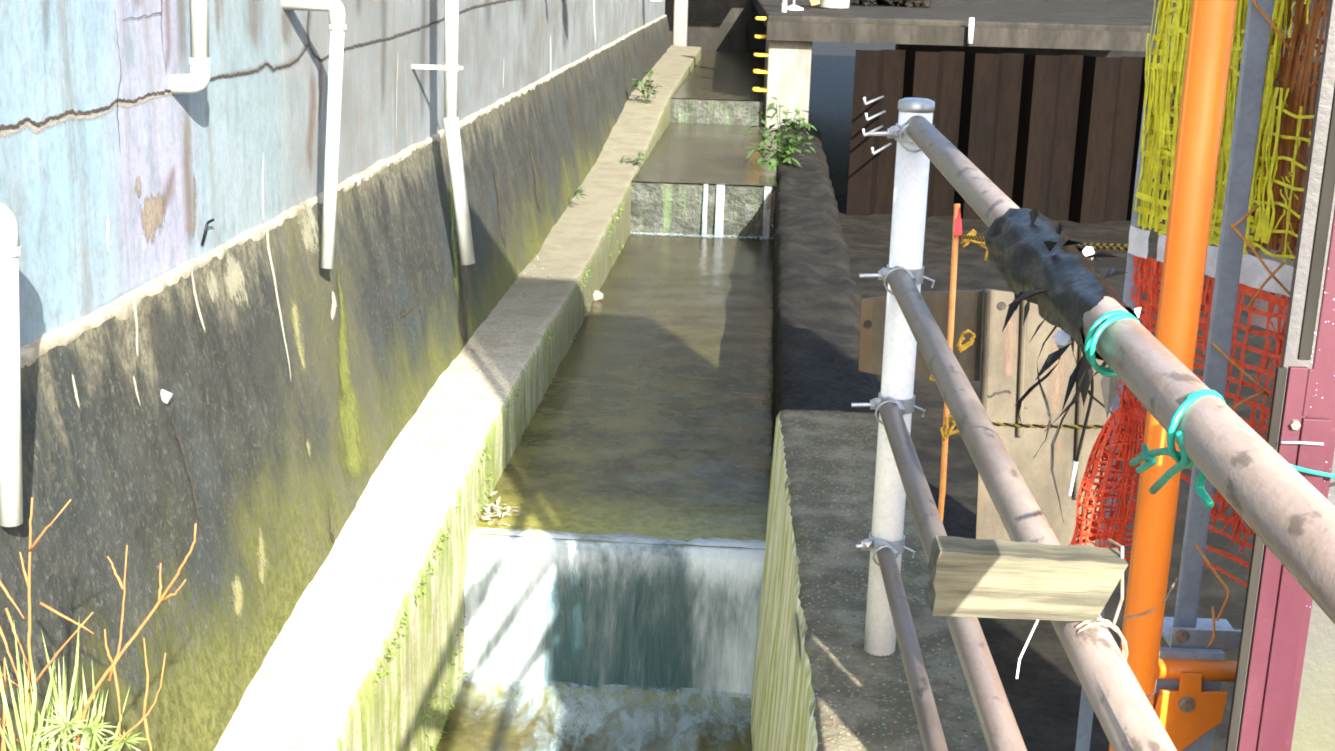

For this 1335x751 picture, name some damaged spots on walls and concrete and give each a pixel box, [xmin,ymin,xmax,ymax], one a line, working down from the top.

crack [0,0,171,154]
crack [210,0,511,81]
peeling [135,176,166,245]